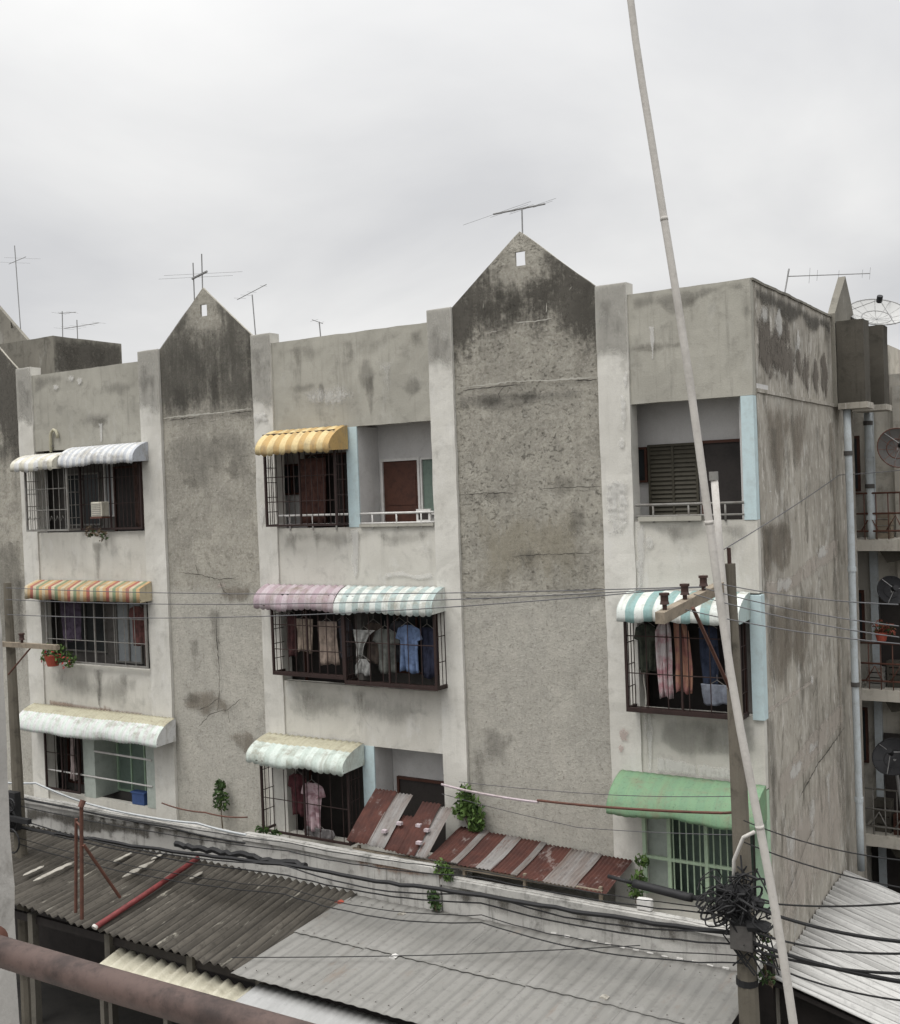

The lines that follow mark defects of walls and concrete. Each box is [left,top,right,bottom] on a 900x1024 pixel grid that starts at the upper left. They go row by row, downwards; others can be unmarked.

damp [137,307,271,410]
damp [426,253,627,362]
damp [757,290,830,348]
crack [180,564,239,727]